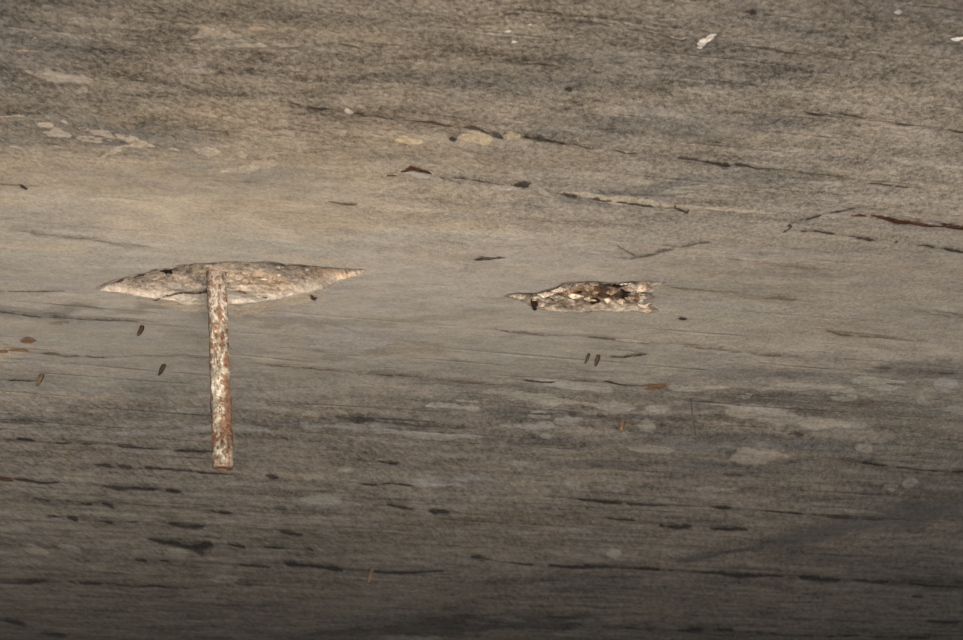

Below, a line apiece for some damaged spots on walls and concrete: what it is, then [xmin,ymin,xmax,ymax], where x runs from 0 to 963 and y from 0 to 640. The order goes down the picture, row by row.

spalling [95,262,365,305]
spalling [505,281,666,313]